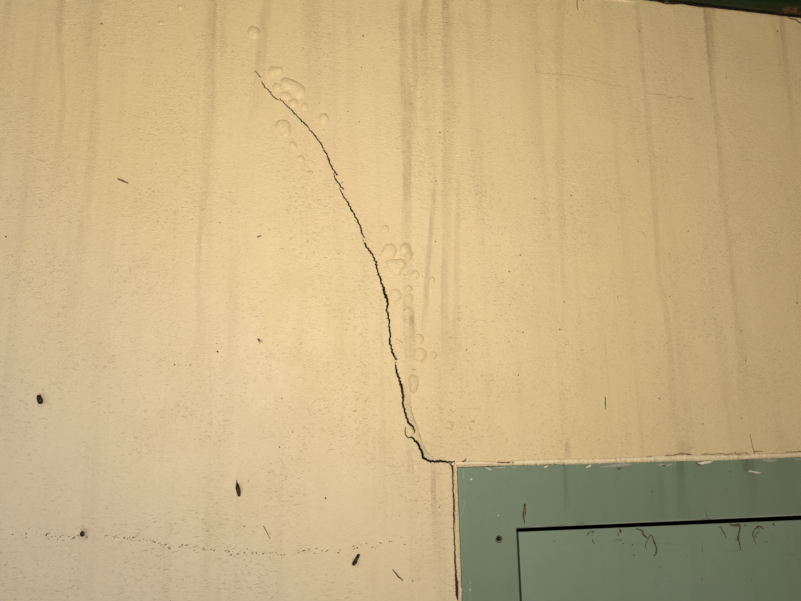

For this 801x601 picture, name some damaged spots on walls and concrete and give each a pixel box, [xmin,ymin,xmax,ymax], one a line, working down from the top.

crack [255,71,459,601]